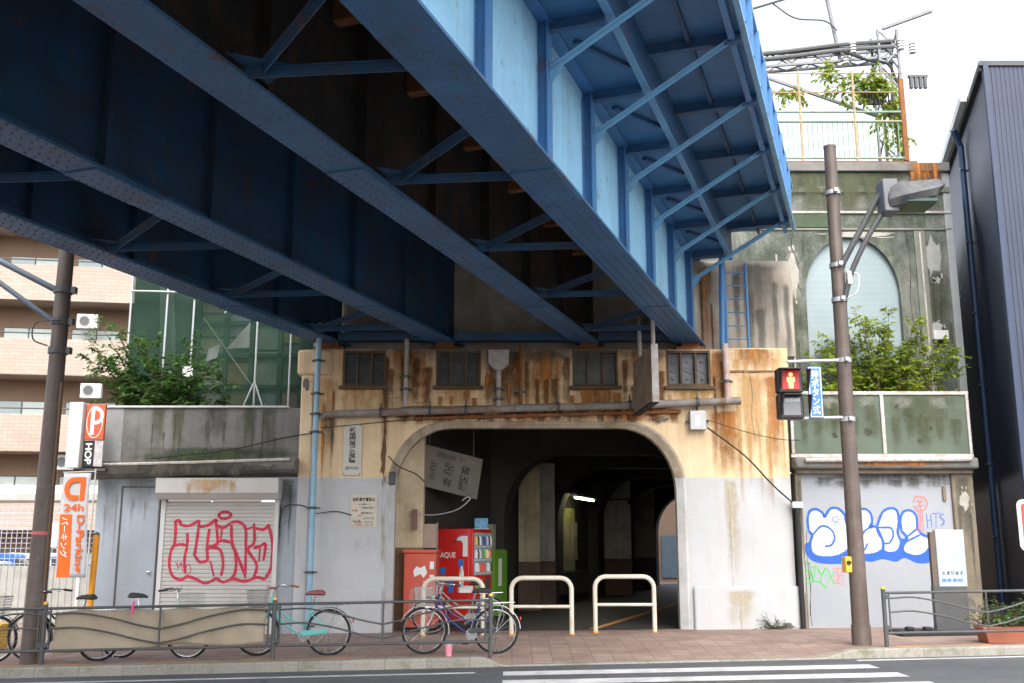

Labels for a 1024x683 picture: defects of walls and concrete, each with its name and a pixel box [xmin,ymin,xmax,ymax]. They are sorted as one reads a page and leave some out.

corrosion [911,163,937,181]
corrosion [321,267,784,473]
damp [174,410,183,451]
damp [245,409,269,448]
spalling [959,486,973,514]